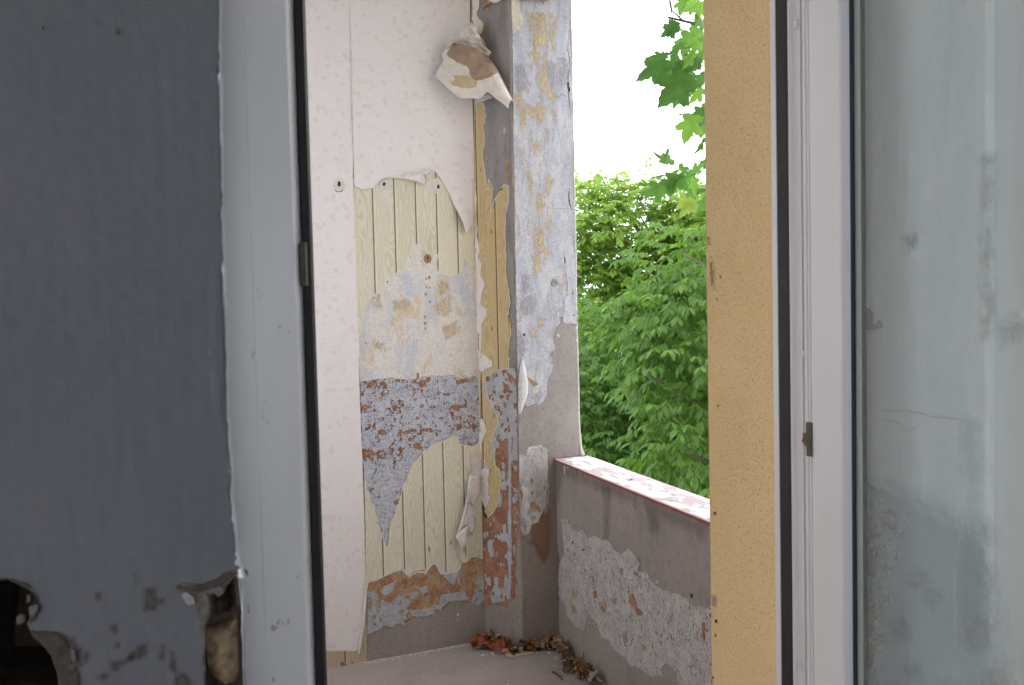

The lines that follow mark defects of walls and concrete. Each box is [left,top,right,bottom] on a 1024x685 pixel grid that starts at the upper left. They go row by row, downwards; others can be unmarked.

peeling [359,0,716,635]
flaking render [0,578,87,685]
hole [175,566,249,685]
peeling [558,518,717,685]